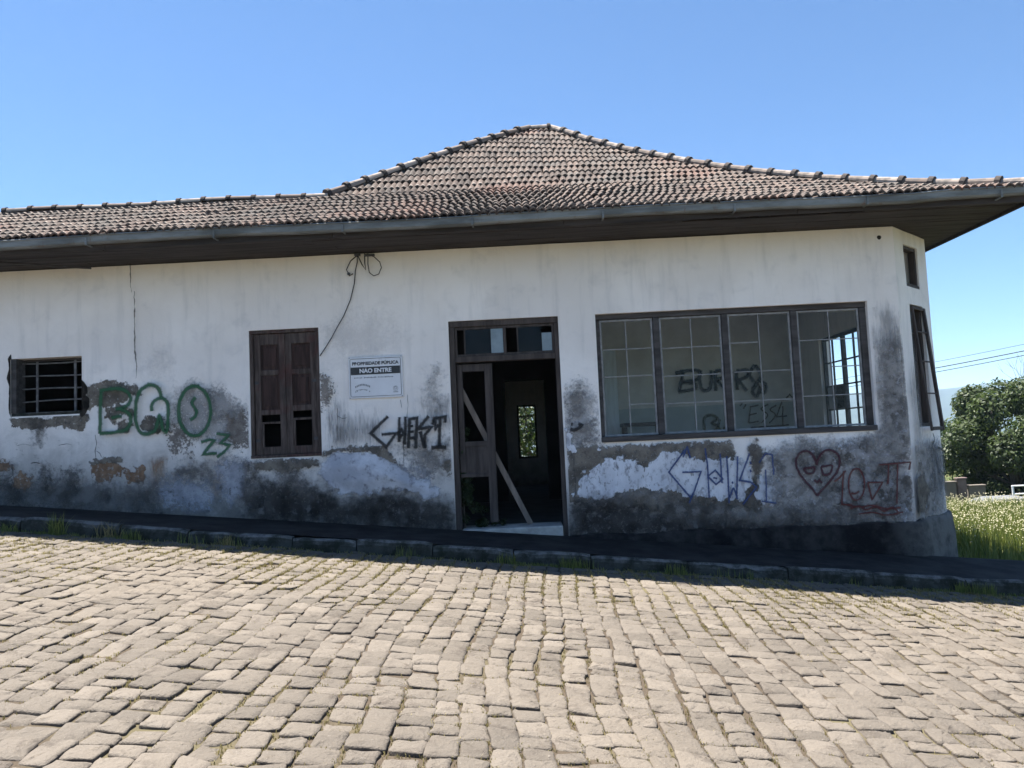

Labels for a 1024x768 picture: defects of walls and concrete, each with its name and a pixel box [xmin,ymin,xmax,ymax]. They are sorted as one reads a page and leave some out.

crack [129,264,137,375]
peeling [7,355,196,459]
peeling [89,456,146,484]
leakage [0,457,453,530]
peeling [220,409,249,453]
leakage [402,438,452,476]
peeling [564,428,781,518]
leakage [570,312,947,537]